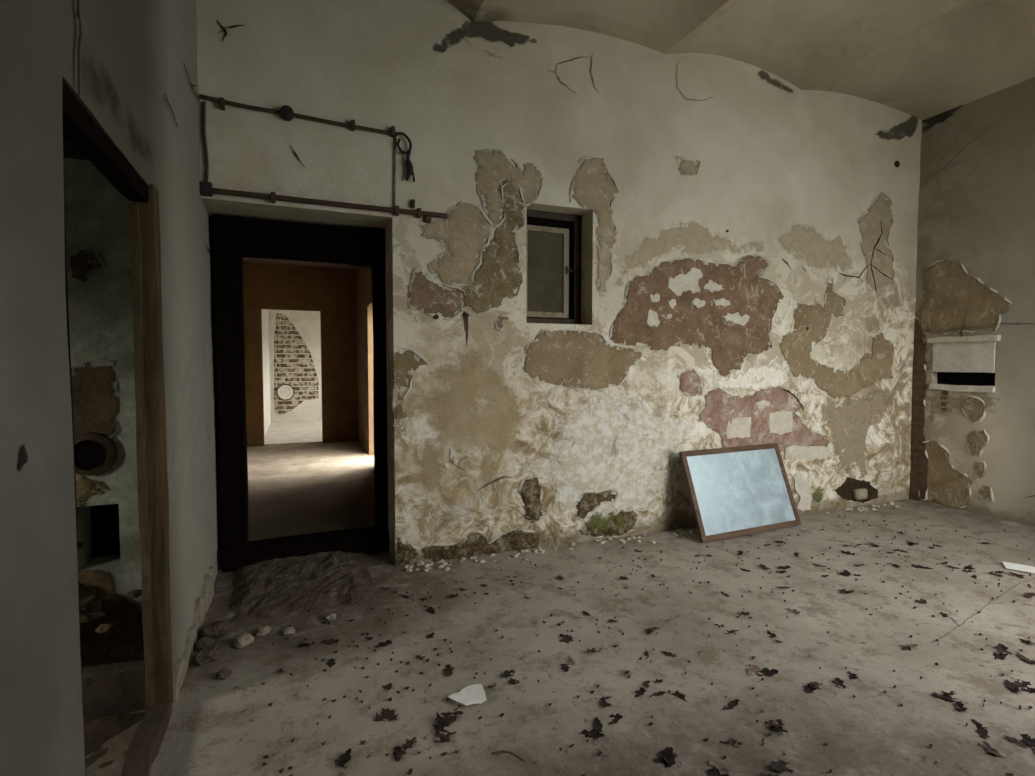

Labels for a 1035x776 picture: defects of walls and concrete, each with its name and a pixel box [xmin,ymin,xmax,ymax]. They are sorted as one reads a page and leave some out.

crack [75,0,83,96]
crack [217,20,244,41]
crack [547,54,597,92]
peeling [408,148,543,345]
peeling [570,157,619,292]
crack [840,226,890,292]
peeling [858,192,895,291]
peeling [71,358,119,506]
peeling [523,254,894,460]
peeling [909,259,1013,509]
spalling [396,475,544,566]
spalling [835,476,879,503]